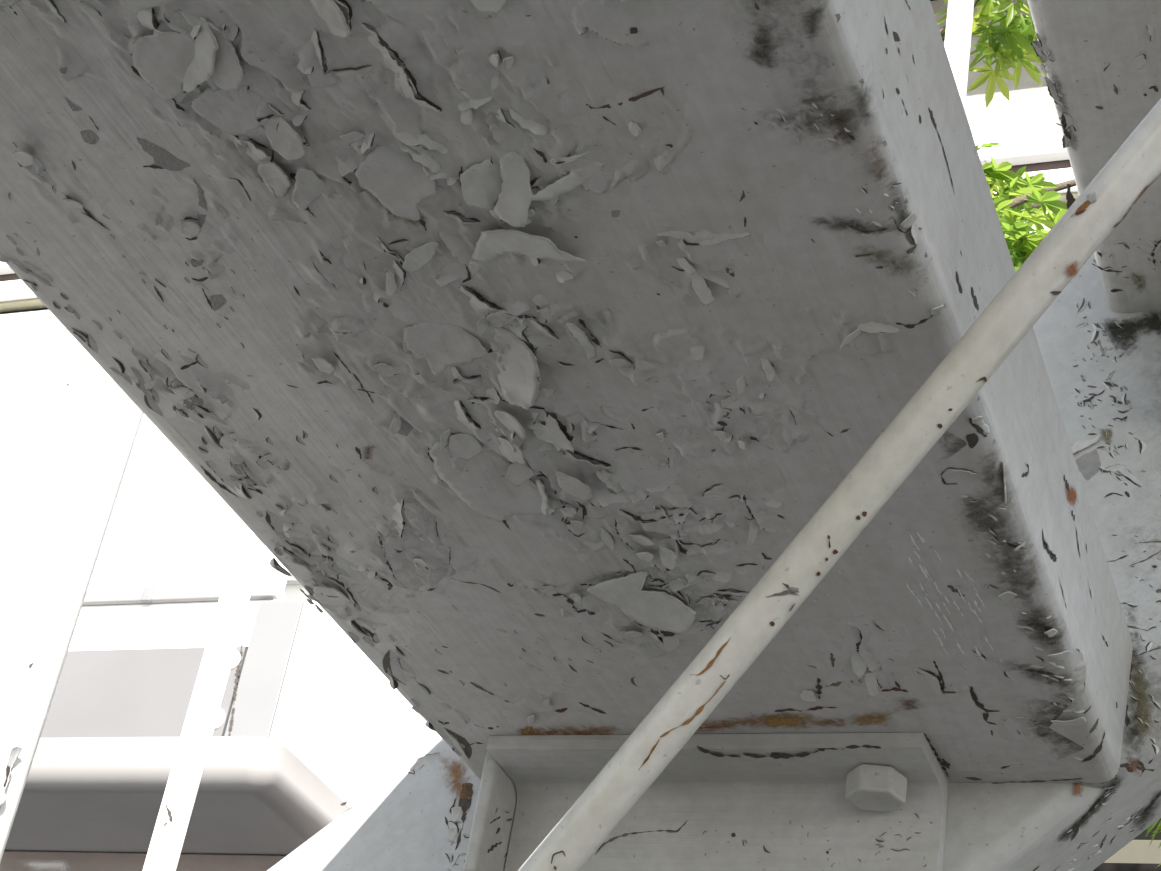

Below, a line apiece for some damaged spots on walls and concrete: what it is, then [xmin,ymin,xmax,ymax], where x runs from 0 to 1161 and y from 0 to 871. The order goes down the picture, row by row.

peeling [119,0,326,217]
peeling [296,0,442,111]
peeling [136,137,208,241]
mould [819,168,923,270]
peeling [336,51,763,664]
mould [952,433,979,452]
peeling [1071,298,1146,487]
mould [941,461,1036,602]
rust [521,727,609,735]
rust [638,639,886,771]
mould [1016,610,1073,686]
mould [1125,634,1161,751]